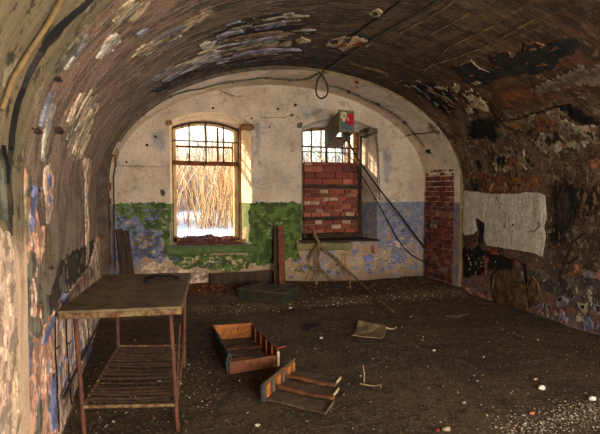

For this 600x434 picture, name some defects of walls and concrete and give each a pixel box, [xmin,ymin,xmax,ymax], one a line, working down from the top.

peeling [112,0,152,25]
peeling [132,6,215,59]
peeling [151,12,328,92]
peeling [326,36,372,51]
flaking render [434,37,600,154]
peeling [0,226,21,434]
peeling [24,89,101,434]
peeling [108,148,344,284]
peeling [361,206,416,277]
flaking render [424,169,455,285]
flaking render [530,264,600,332]